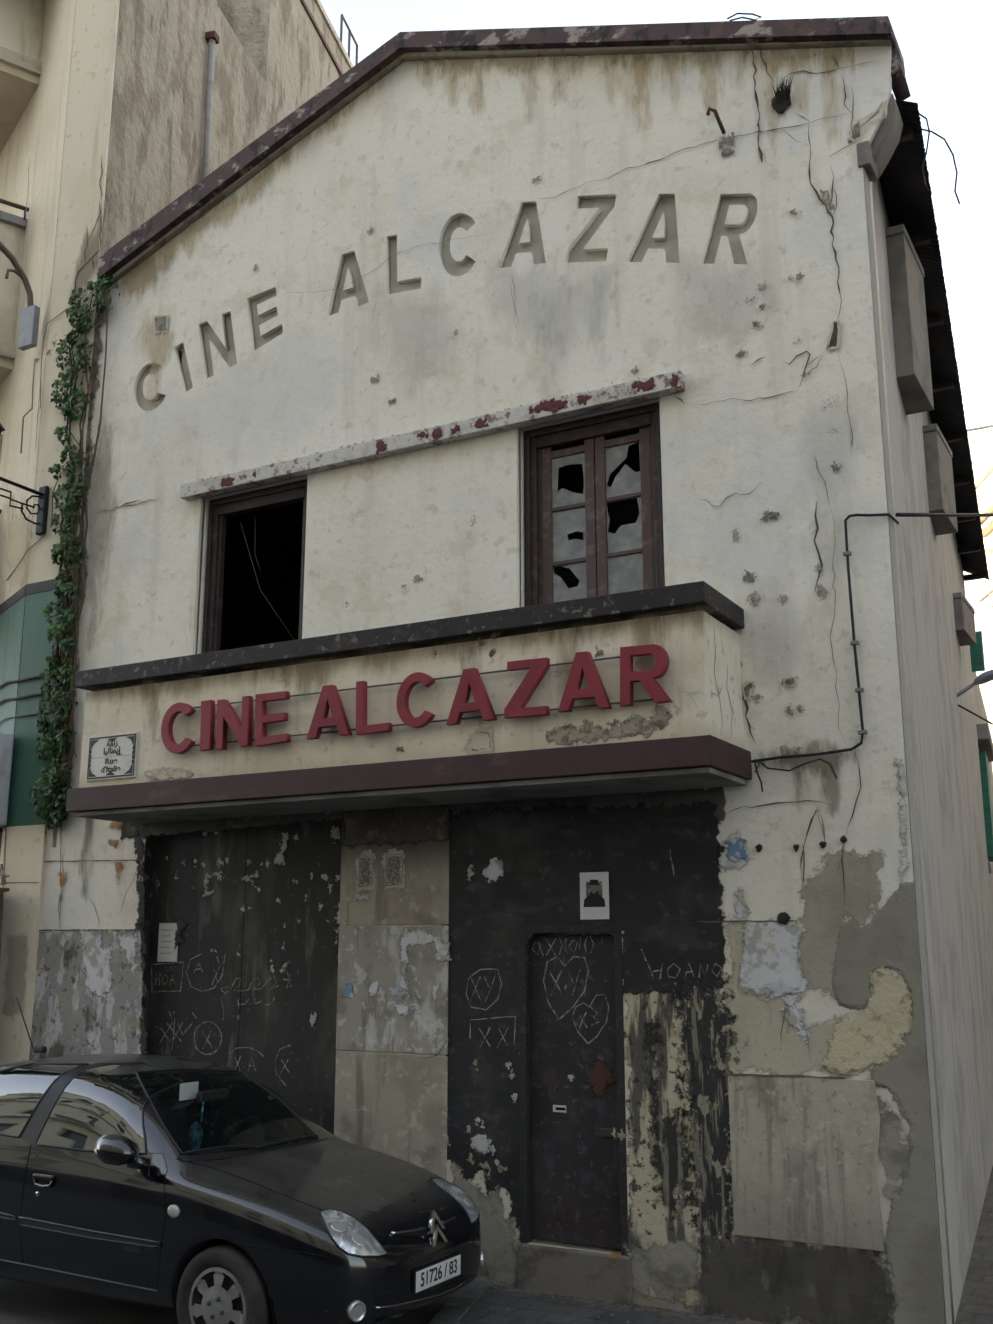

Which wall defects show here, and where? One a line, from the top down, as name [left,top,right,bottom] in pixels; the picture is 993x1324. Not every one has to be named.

crack [531,49,882,318]
peeling [417,383,613,440]
peeling [630,365,678,392]
crack [674,351,853,453]
crack [701,482,761,510]
spalling [539,704,672,746]
crack [684,623,756,744]
crack [730,454,862,904]
spalling [777,912,790,924]
flaking render [450,1117,517,1286]